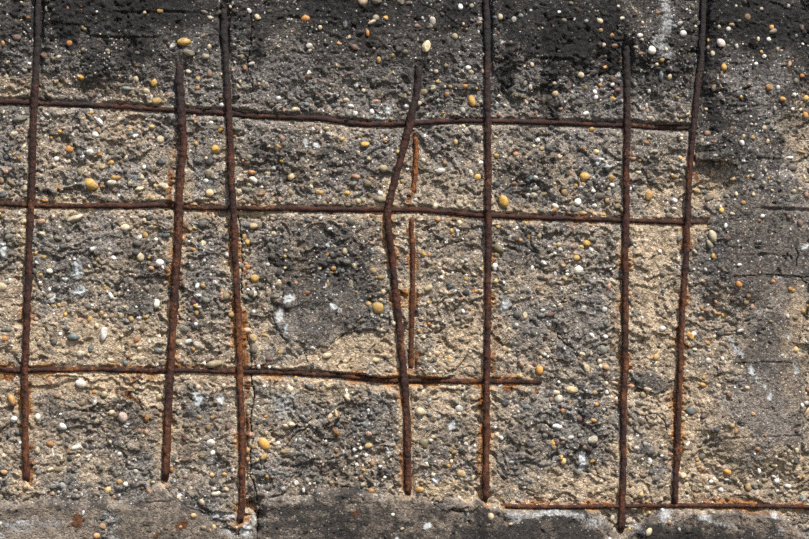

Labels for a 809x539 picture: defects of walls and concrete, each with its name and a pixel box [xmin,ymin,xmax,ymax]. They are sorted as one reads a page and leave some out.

leakage [0,0,22,16]
leakage [42,0,228,62]
leakage [295,0,412,54]
leakage [444,0,476,33]
leakage [653,0,673,58]
leakage [495,0,634,126]
leakage [701,0,809,133]
spalling [0,0,623,539]
spalling [489,0,809,539]
leakage [212,512,256,538]
leakage [507,510,605,528]
leakage [632,510,735,539]